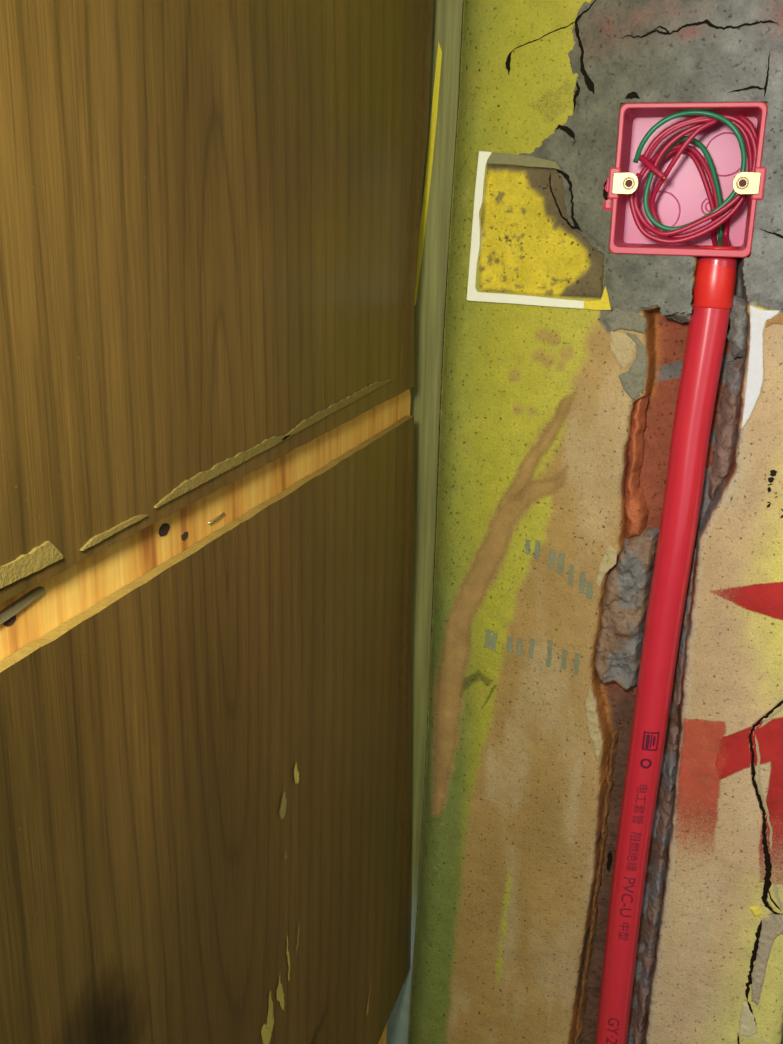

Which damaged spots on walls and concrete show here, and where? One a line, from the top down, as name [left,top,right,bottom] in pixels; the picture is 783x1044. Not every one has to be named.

crack [618,19,778,38]
crack [505,0,596,141]
crack [625,91,640,99]
crack [729,54,770,97]
crack [549,168,581,231]
crack [601,179,609,200]
peeling [606,308,647,400]
peeling [596,545,617,587]
peeling [585,685,603,764]
crack [737,700,783,1044]